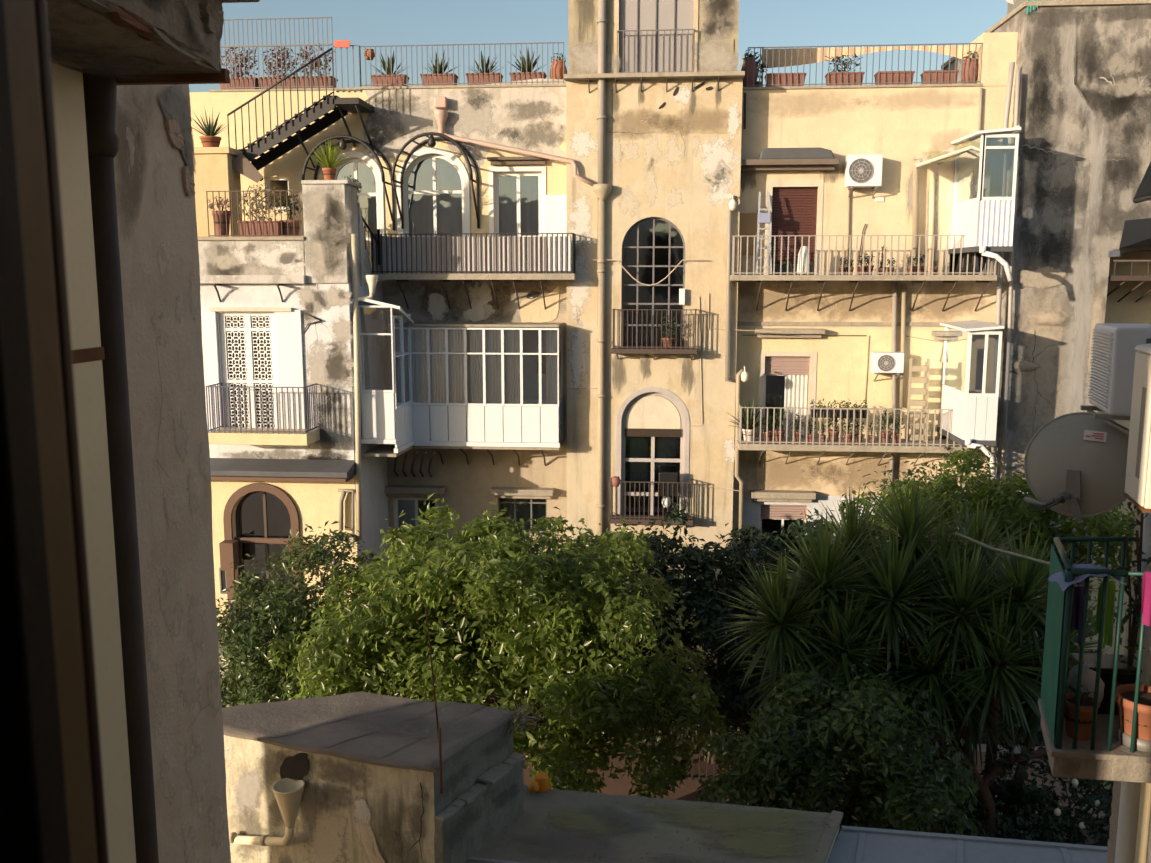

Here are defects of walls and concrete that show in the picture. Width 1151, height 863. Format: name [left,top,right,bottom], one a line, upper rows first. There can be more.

spalling [76,0,224,61]
damp [693,0,740,79]
flaking render [159,84,196,196]
damp [500,102,561,146]
damp [205,245,281,275]
damp [301,189,351,281]
damp [1018,4,1151,412]
damp [239,807,260,847]
damp [261,752,283,780]
damp [270,801,282,821]
damp [320,760,361,808]
crack [406,783,425,863]